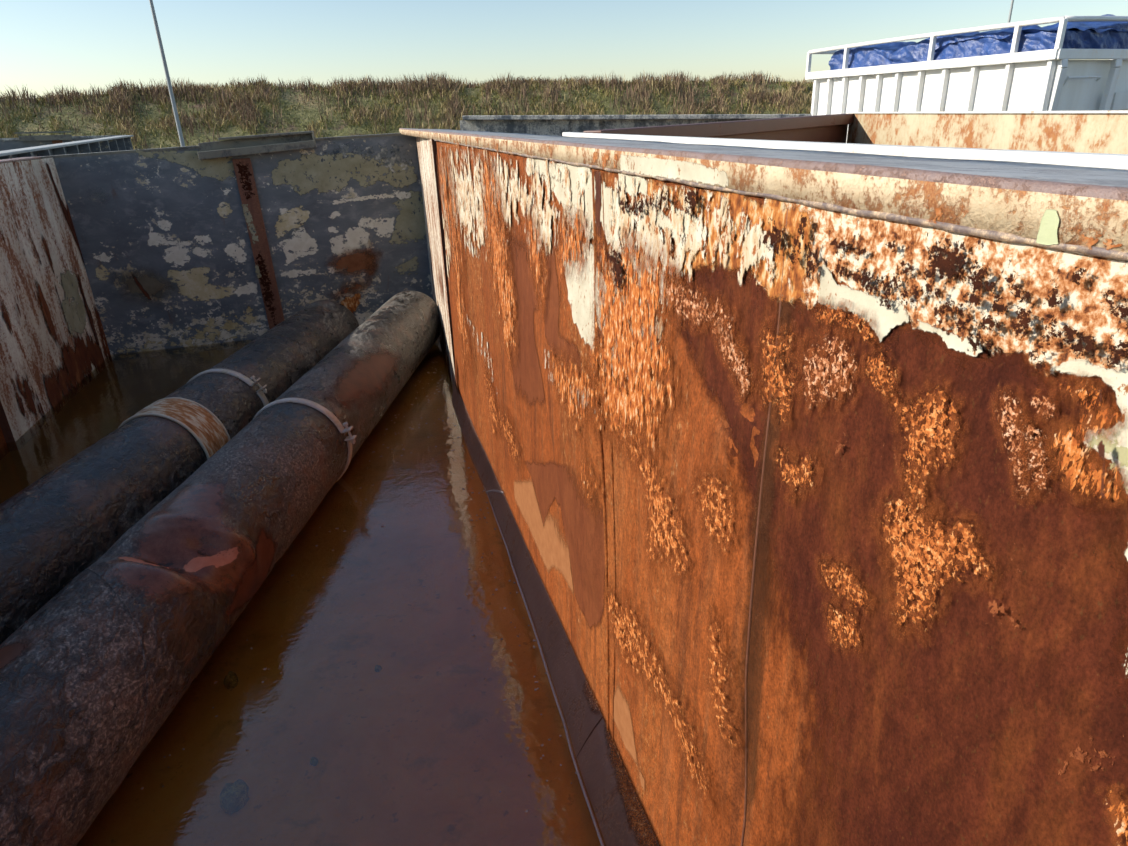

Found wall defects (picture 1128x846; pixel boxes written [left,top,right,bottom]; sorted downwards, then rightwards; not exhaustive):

corrosion [0,195,112,418]
spalling [93,251,113,281]
peeling [133,148,234,218]
spalling [147,218,258,302]
peeling [284,272,381,308]
peeling [271,141,426,266]
corrosion [329,249,380,313]
peeling [439,145,788,393]
peeling [818,264,982,357]
peeling [1036,209,1059,245]
peeling [1050,359,1128,494]
corrosion [430,134,1128,846]